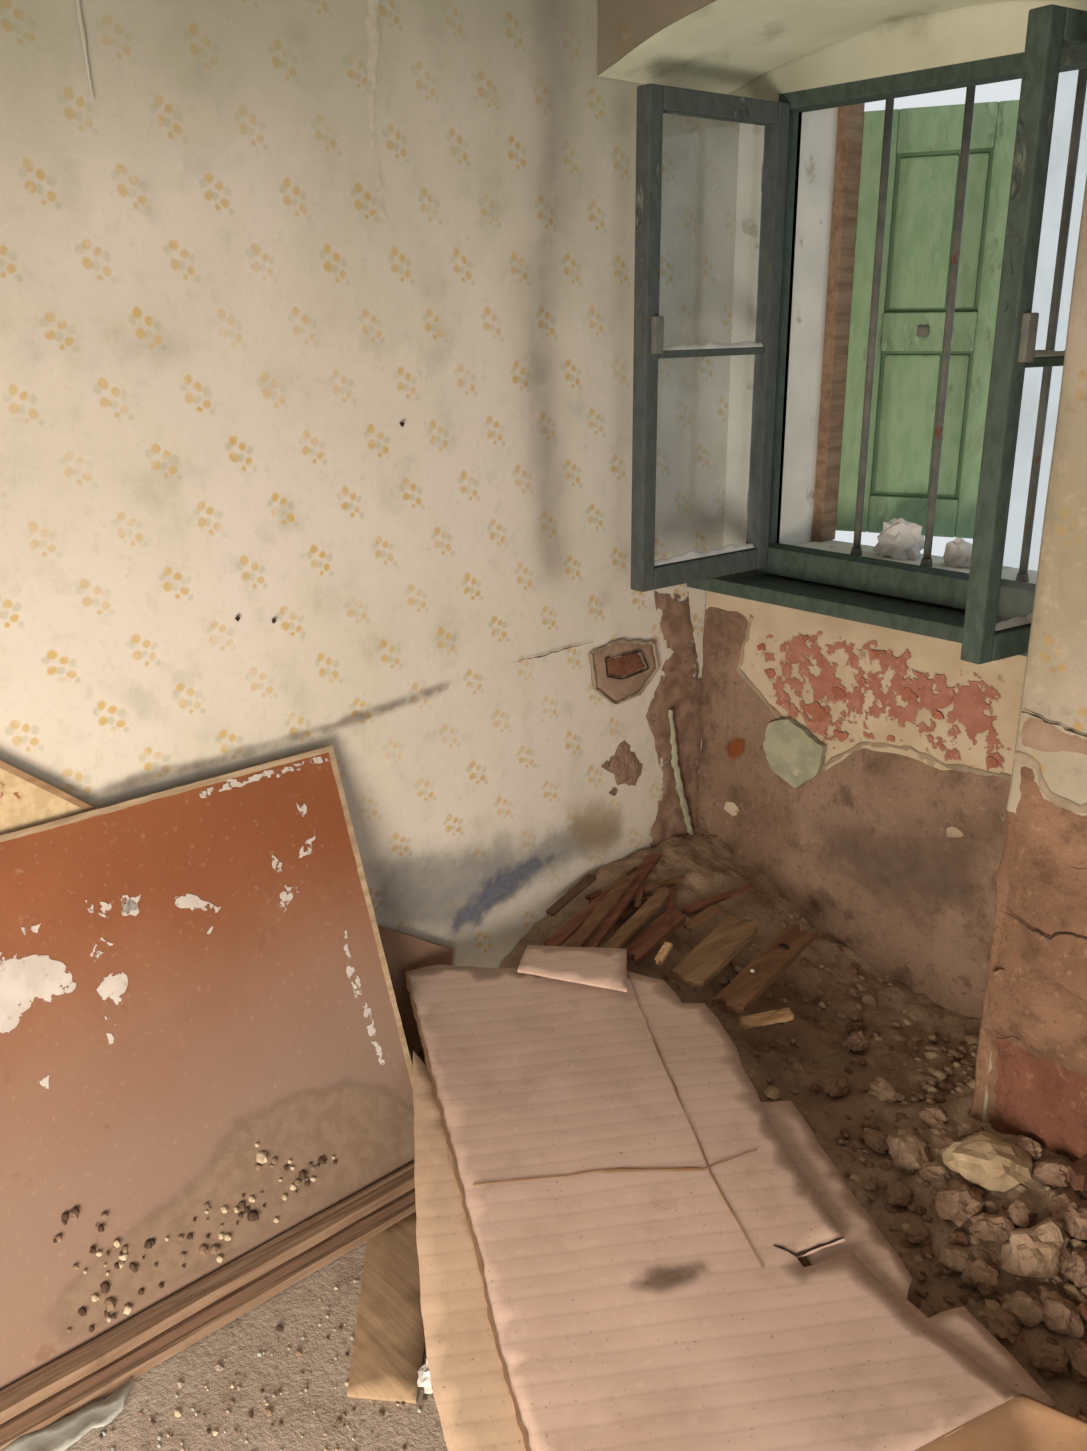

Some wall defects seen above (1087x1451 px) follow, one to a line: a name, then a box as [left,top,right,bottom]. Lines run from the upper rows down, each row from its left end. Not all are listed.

leakage [384,833,597,930]
spalling [588,590,1087,1163]
crack [1000,910,1087,940]